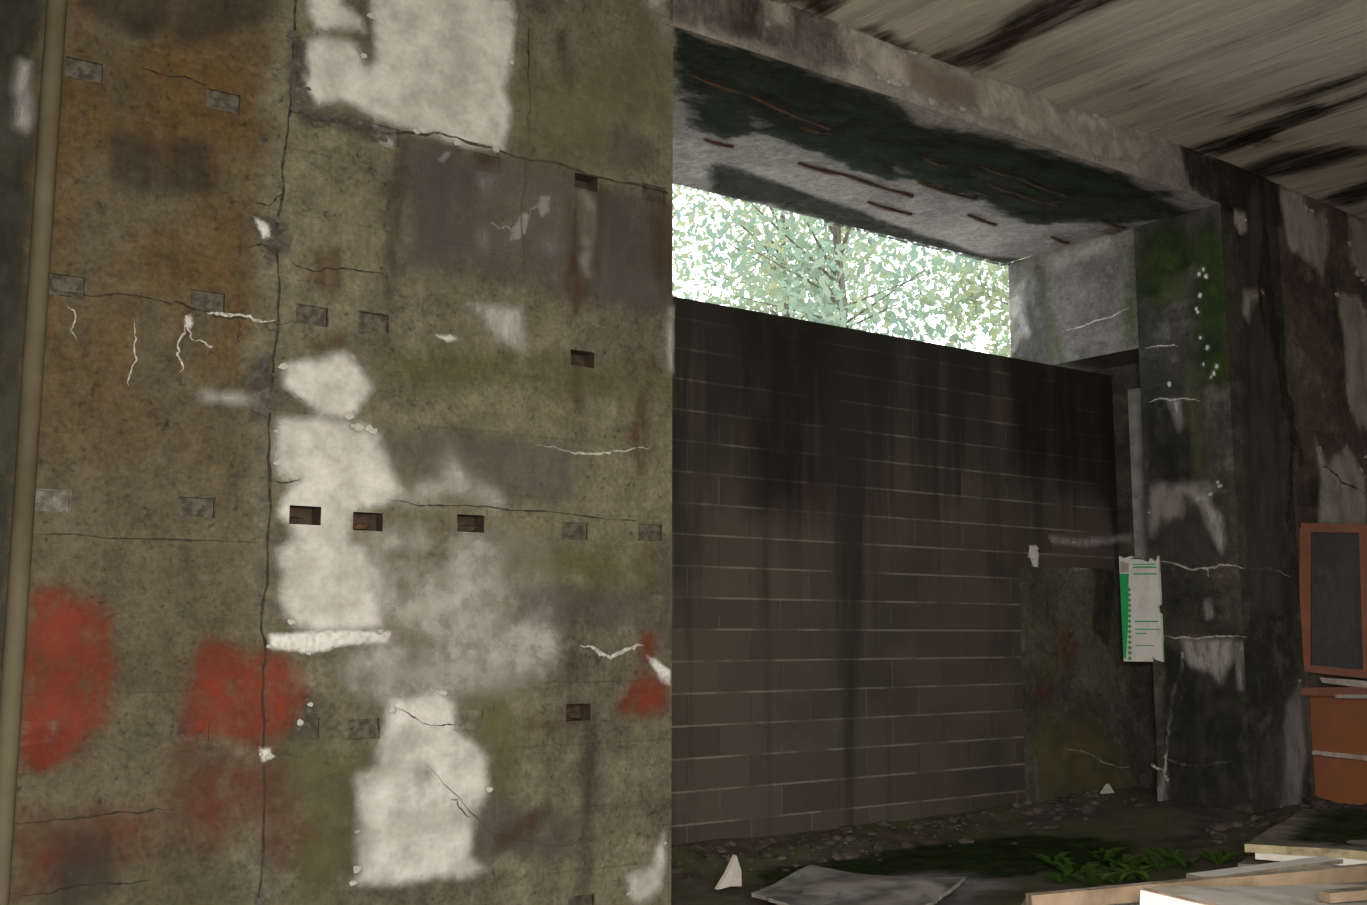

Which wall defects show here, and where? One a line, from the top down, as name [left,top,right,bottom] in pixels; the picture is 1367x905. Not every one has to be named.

peeling [286,0,515,153]
water stain [711,165,1023,266]
water stain [1030,195,1189,223]
peeling [1281,190,1329,276]
water stain [1180,72,1367,613]
peeling [1335,217,1367,430]
peeling [266,350,403,655]
crack [15,0,668,898]
water stain [1148,401,1191,485]
peeling [1128,388,1223,561]
peeling [1316,446,1367,524]
peeling [349,690,493,886]